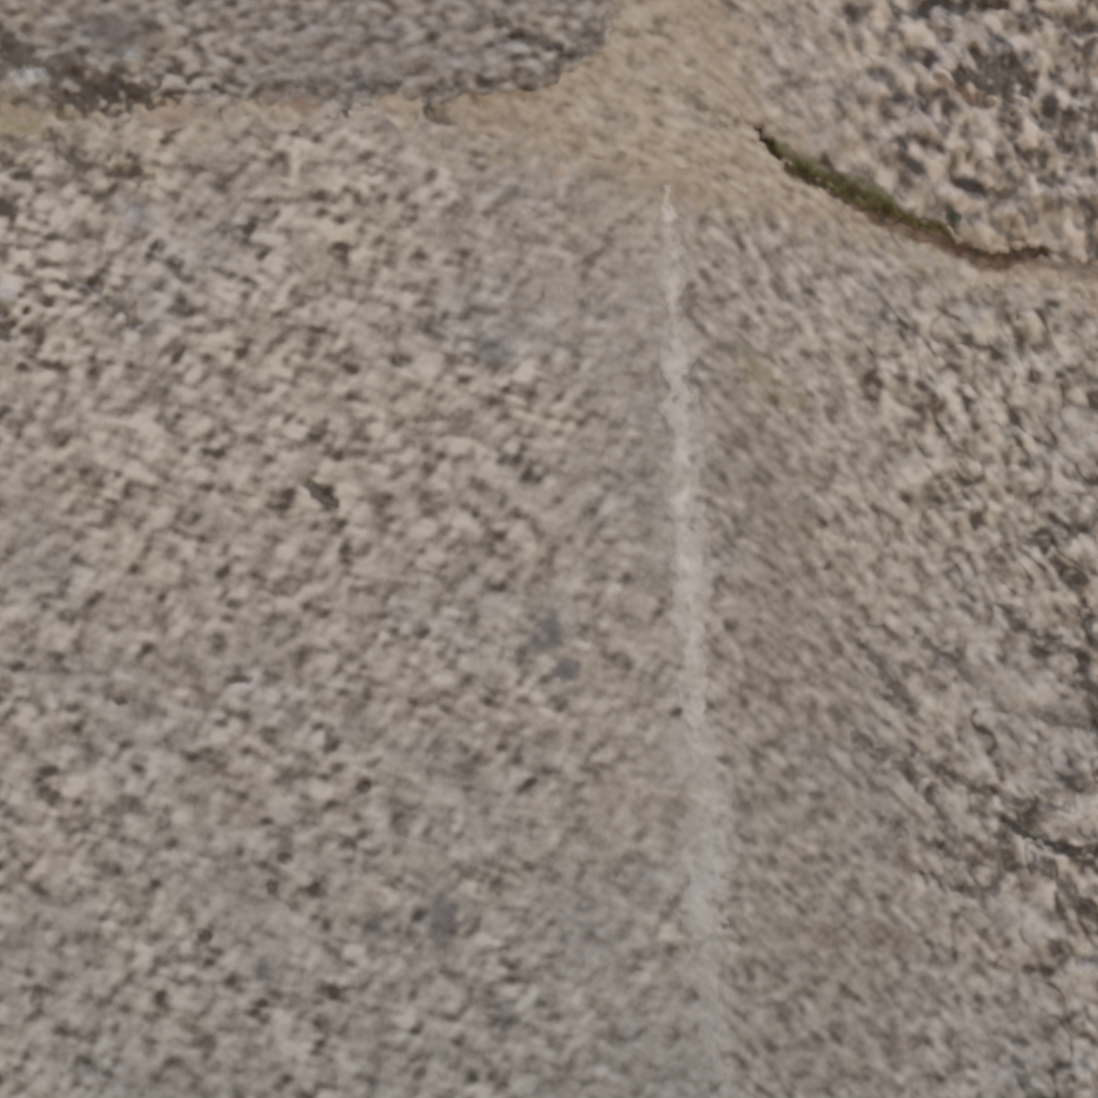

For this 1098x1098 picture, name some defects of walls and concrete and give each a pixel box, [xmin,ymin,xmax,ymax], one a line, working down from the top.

crack [754,128,1068,264]
crack [960,815,1098,918]